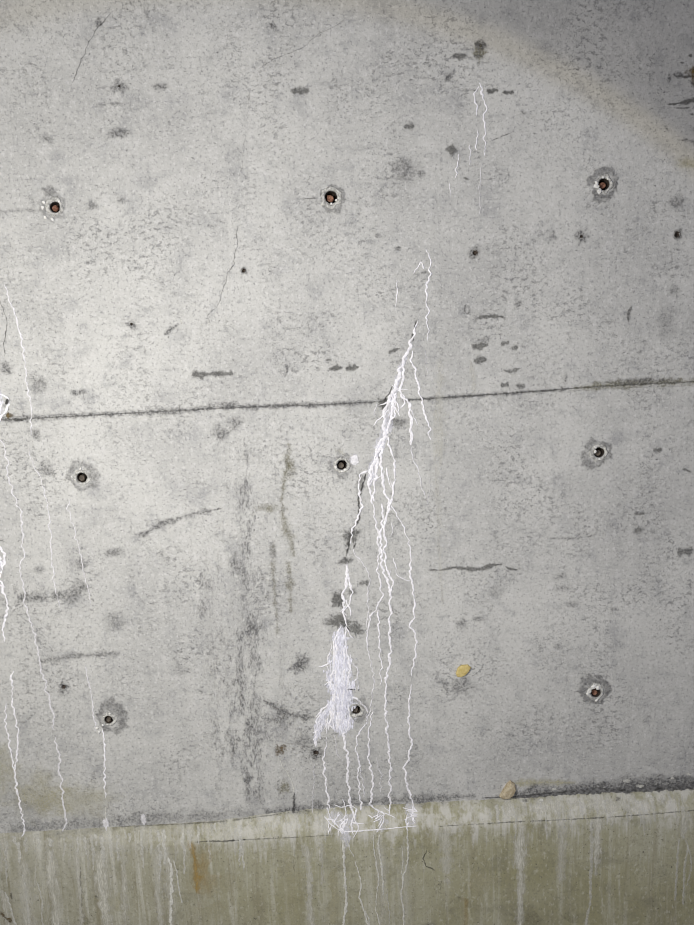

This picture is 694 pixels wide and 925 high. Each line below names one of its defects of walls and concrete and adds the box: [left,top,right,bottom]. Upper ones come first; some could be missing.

damp [4,284,43,436]
crack [340,452,380,564]
damp [0,440,224,925]
crack [325,581,368,636]
damp [265,249,432,925]
efflorescence [496,802,527,925]